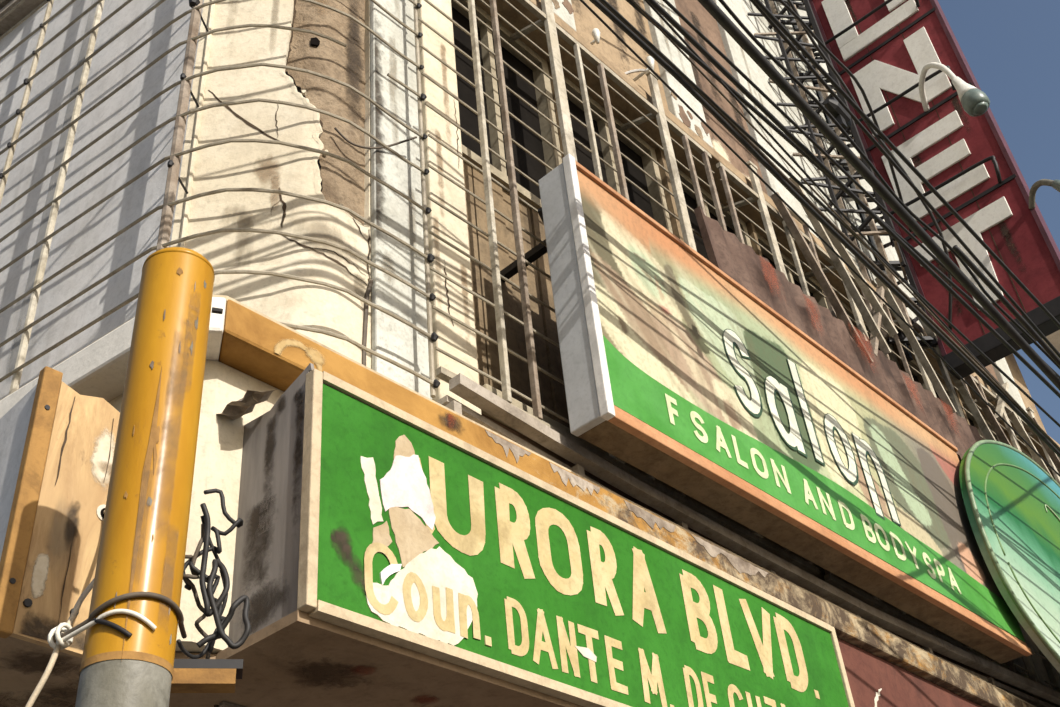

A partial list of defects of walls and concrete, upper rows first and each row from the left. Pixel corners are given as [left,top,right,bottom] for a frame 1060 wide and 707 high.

crack [208,0,306,141]
flaking render [279,0,369,227]
crack [316,120,324,192]
crack [272,188,371,285]
peeling [485,430,531,463]
peeling [549,462,600,495]
peeling [624,500,676,532]
peeling [690,533,768,577]
water stain [0,617,85,707]